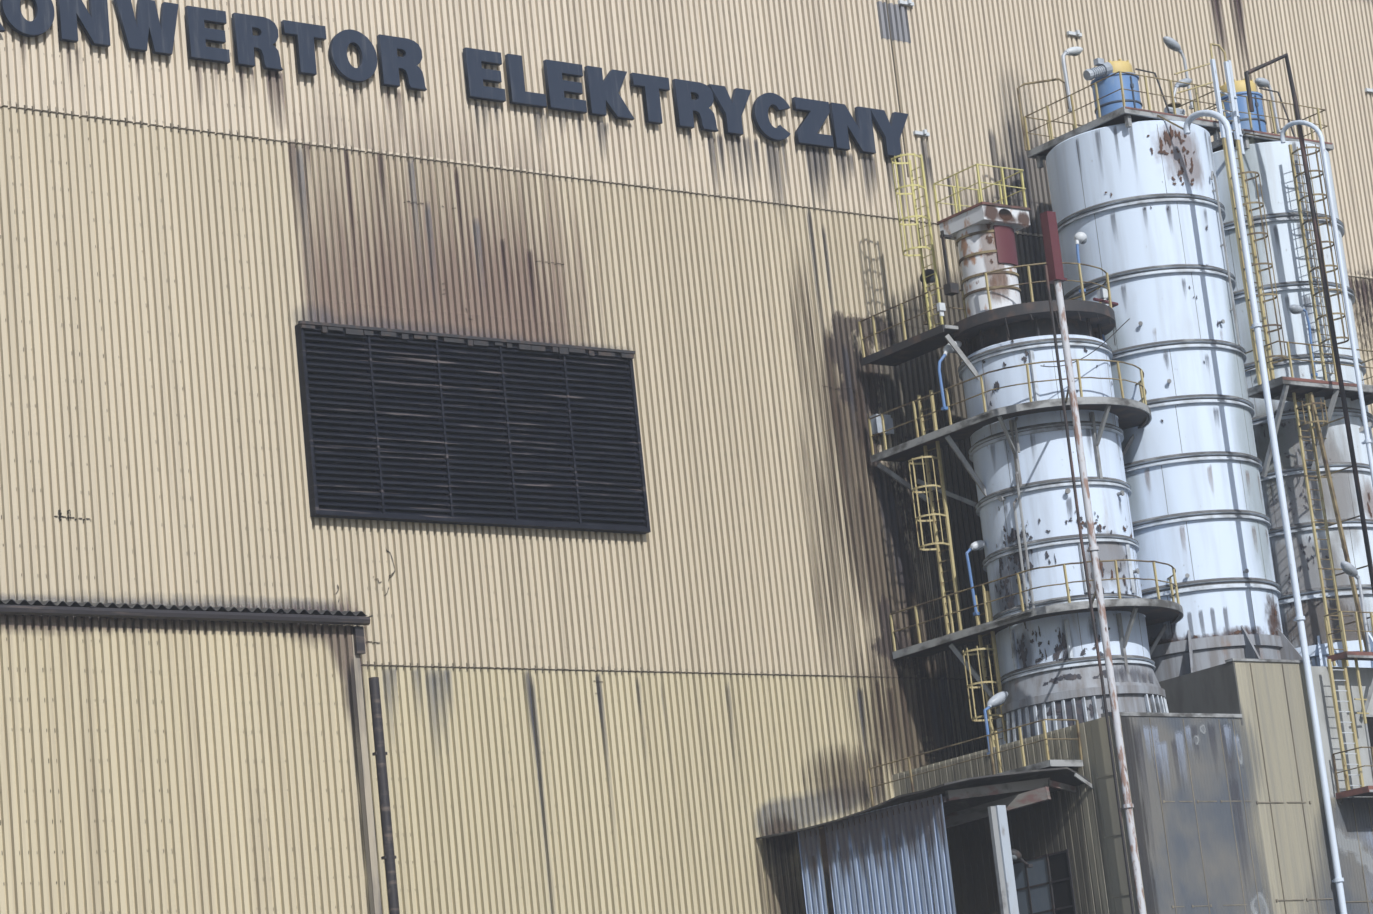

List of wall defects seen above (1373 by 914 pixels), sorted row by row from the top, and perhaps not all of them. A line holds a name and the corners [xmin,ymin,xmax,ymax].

corrosion [1147,125,1195,185]
corrosion [985,205,1030,227]
corrosion [1081,521,1132,594]
damp [1144,728,1190,758]